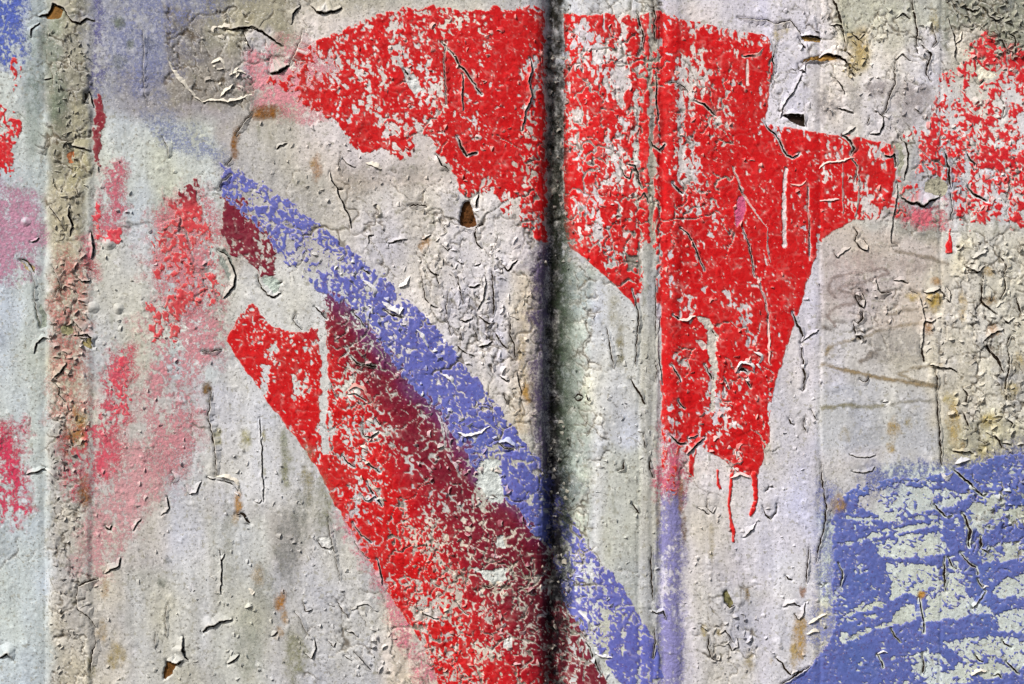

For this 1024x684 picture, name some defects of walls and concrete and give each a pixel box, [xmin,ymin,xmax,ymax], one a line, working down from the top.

peeling [38,0,105,241]
peeling [168,56,252,102]
crack [738,0,962,256]
peeling [783,13,937,136]
crack [944,150,988,220]
peeling [942,0,1024,141]
peeling [392,176,536,416]
leakage [545,0,580,684]
crack [894,276,926,362]
peeling [922,241,1024,458]
crack [160,390,264,524]
crack [935,392,986,548]